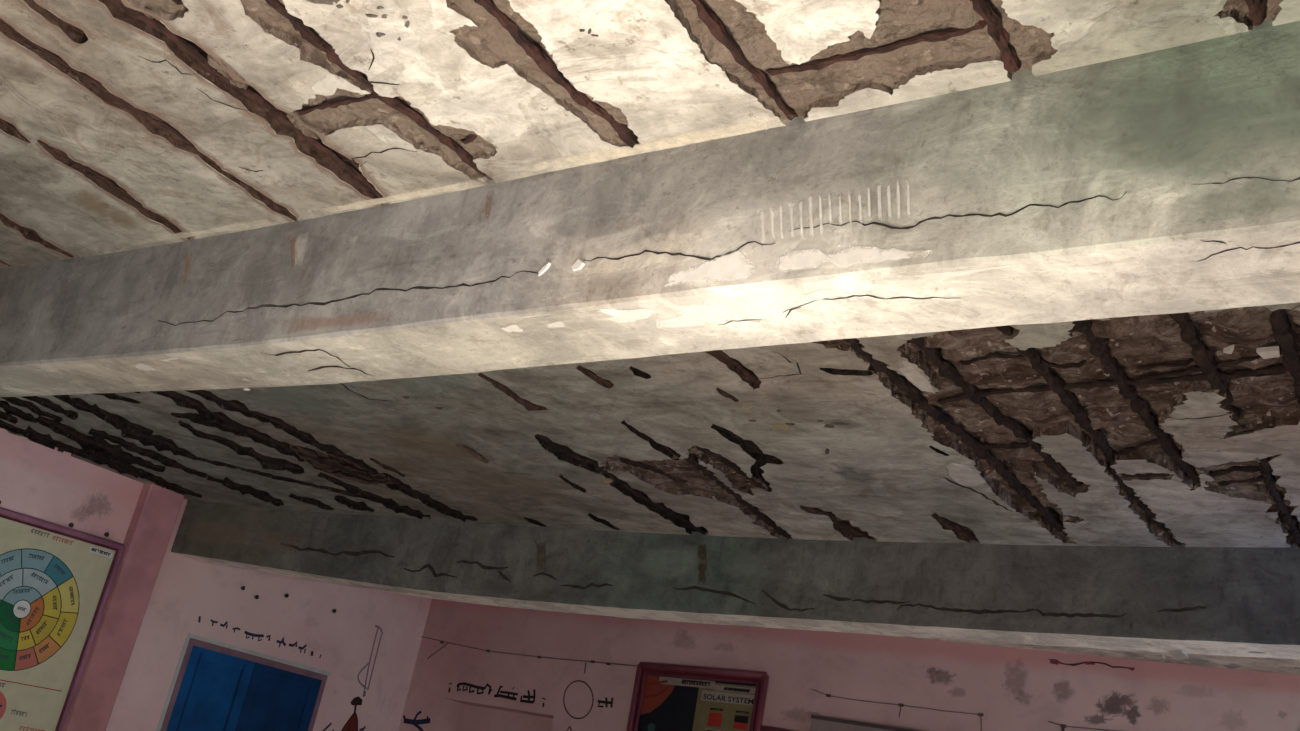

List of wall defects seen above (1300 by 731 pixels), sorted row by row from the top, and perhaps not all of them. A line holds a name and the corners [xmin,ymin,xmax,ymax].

spalling [0,0,299,241]
spalling [85,0,497,207]
spalling [446,0,641,148]
spalling [665,0,1058,125]
crack [158,271,546,326]
crack [584,191,1127,261]
crack [782,295,951,318]
crack [1197,240,1300,262]
spalling [0,388,478,523]
spalling [812,306,1300,548]
crack [673,586,1127,618]
damp [1086,693,1141,725]